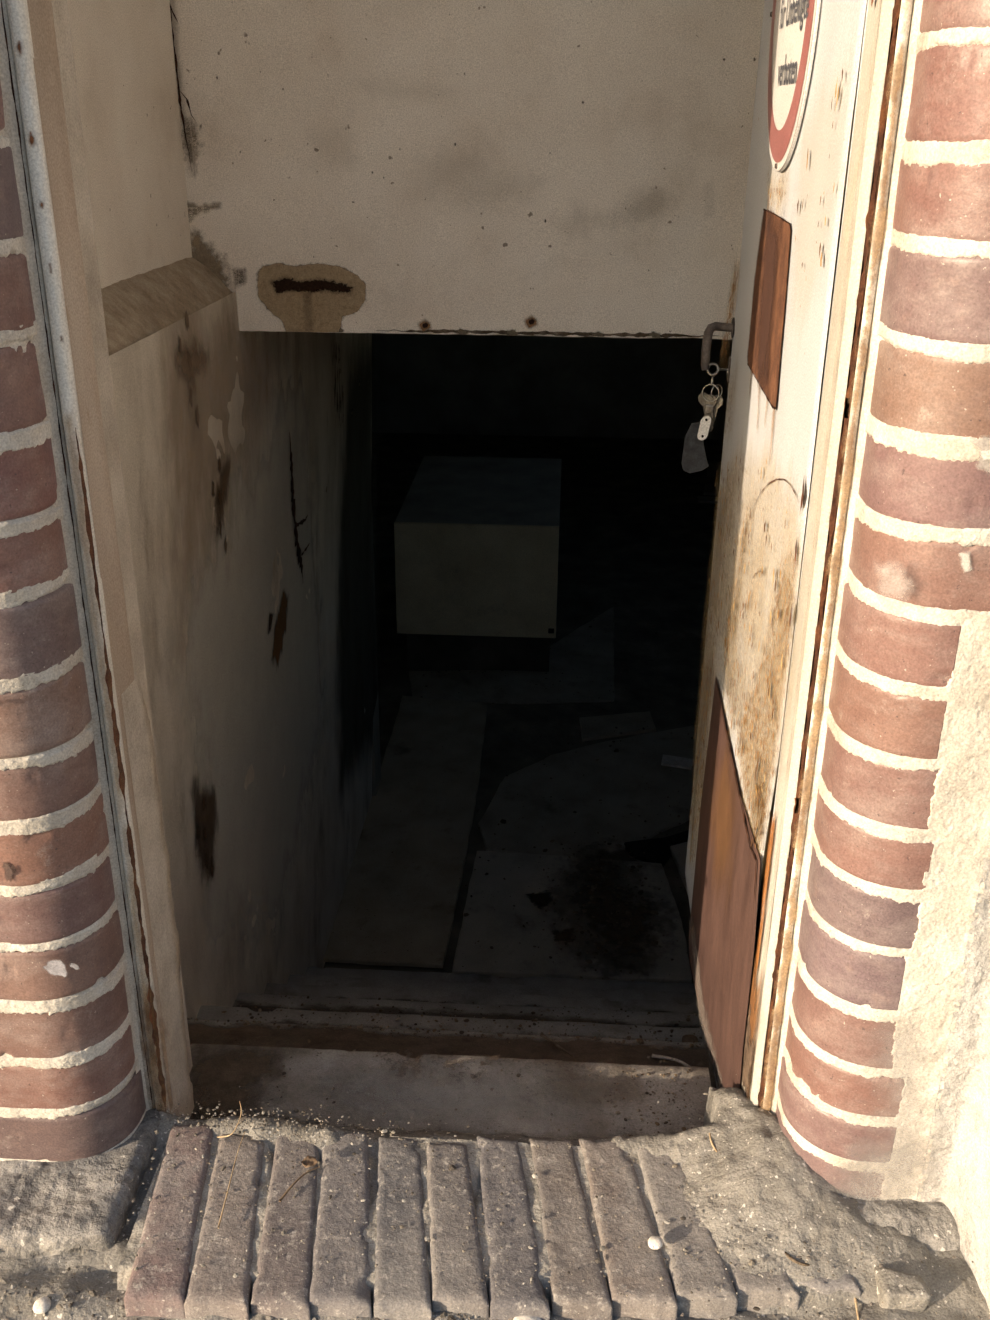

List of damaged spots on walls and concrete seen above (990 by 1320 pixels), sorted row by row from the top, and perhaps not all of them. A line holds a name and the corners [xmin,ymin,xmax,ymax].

damp [191,231,245,287]
spalling [257,256,366,333]
spalling [376,329,715,338]
crack [289,432,310,577]
rust [689,0,904,1111]
rust [268,591,288,667]
rust [75,427,168,1112]